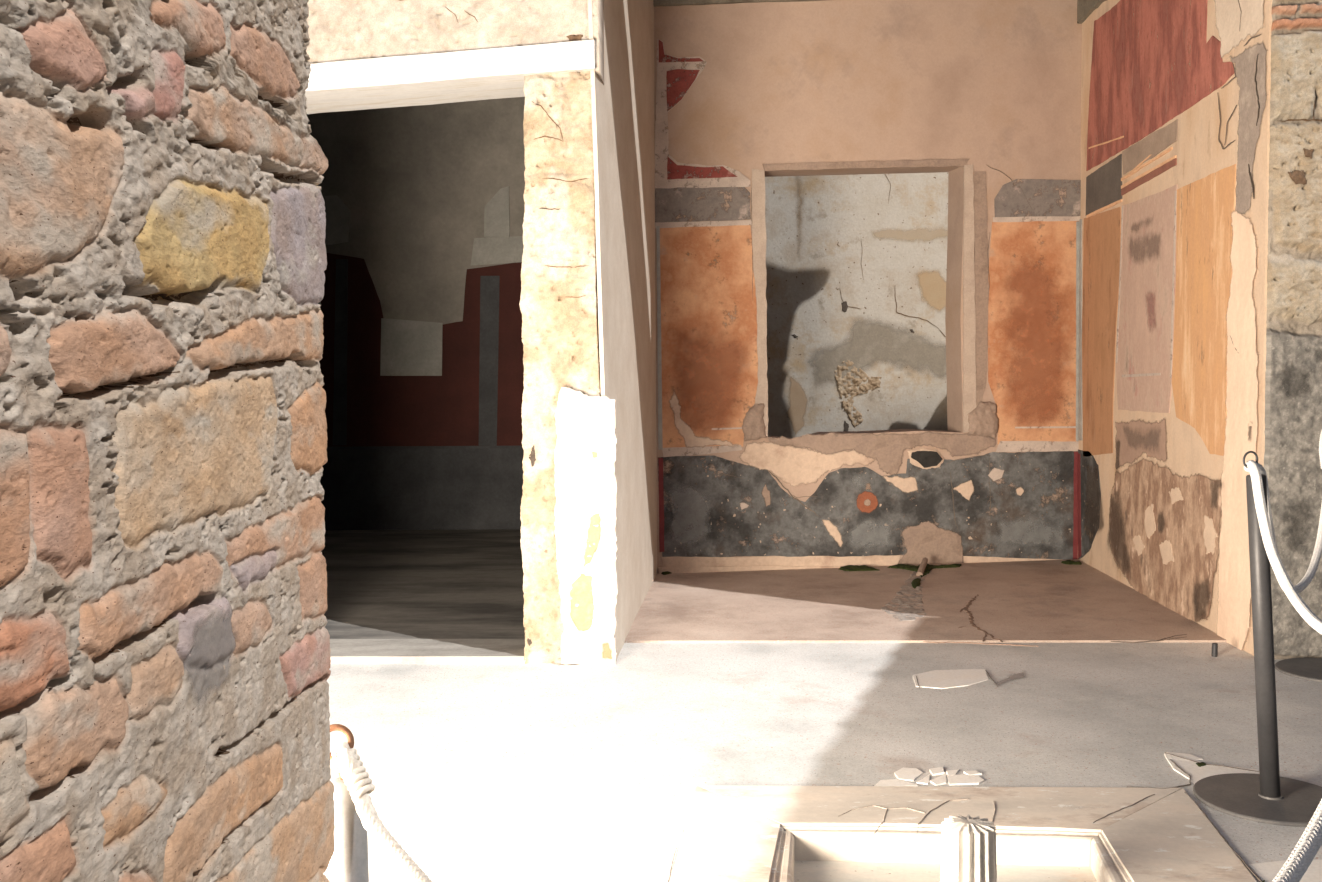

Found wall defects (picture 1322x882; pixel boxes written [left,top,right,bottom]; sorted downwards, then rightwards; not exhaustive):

flaking render [1215,0,1267,214]
flaking render [669,320,999,475]
flaking render [762,484,771,506]
flaking render [954,480,974,500]
flaking render [988,467,1004,481]
peeling [1109,419,1222,622]
crack [881,572,1038,687]
crack [838,799,995,834]